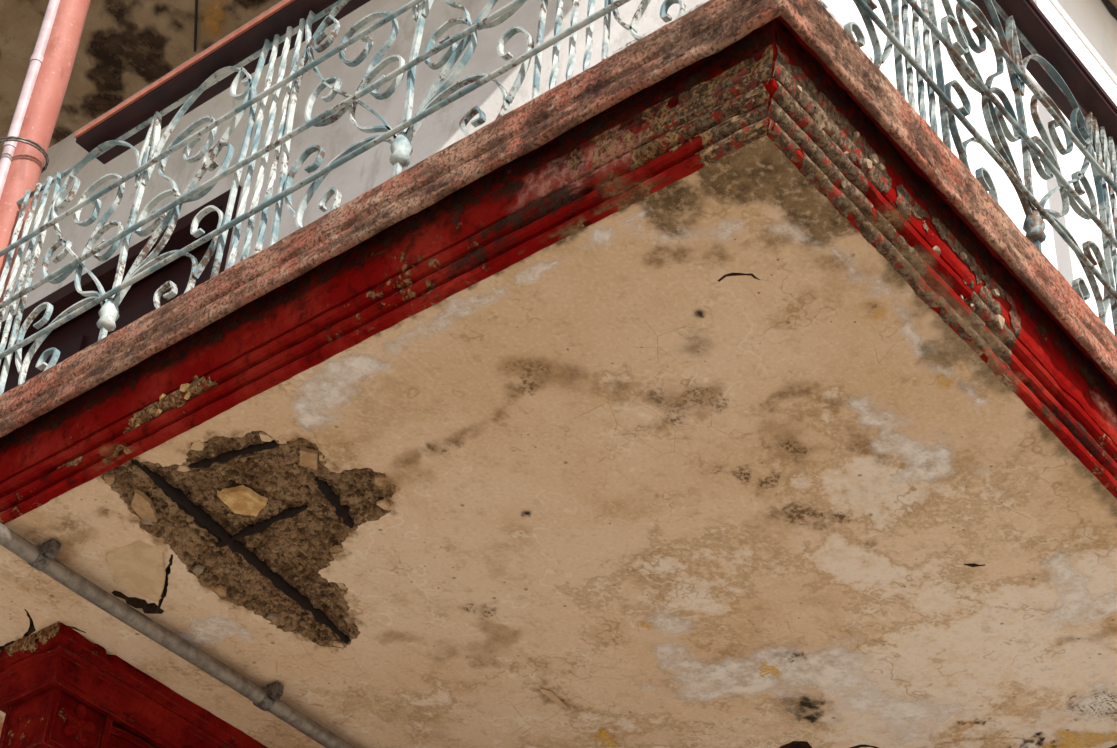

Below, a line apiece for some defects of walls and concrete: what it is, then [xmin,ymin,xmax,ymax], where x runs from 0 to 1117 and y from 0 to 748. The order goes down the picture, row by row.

mould [64,0,171,118]
mould [52,129,71,143]
water stain [517,261,558,282]
water stain [551,138,1019,392]
peeling [553,43,1021,374]
water stain [295,282,505,428]
peeling [57,456,83,469]
spalling [100,375,396,650]
water stain [850,399,951,483]
water stain [649,614,962,741]
crack [850,740,879,748]
spalling [1041,732,1117,748]